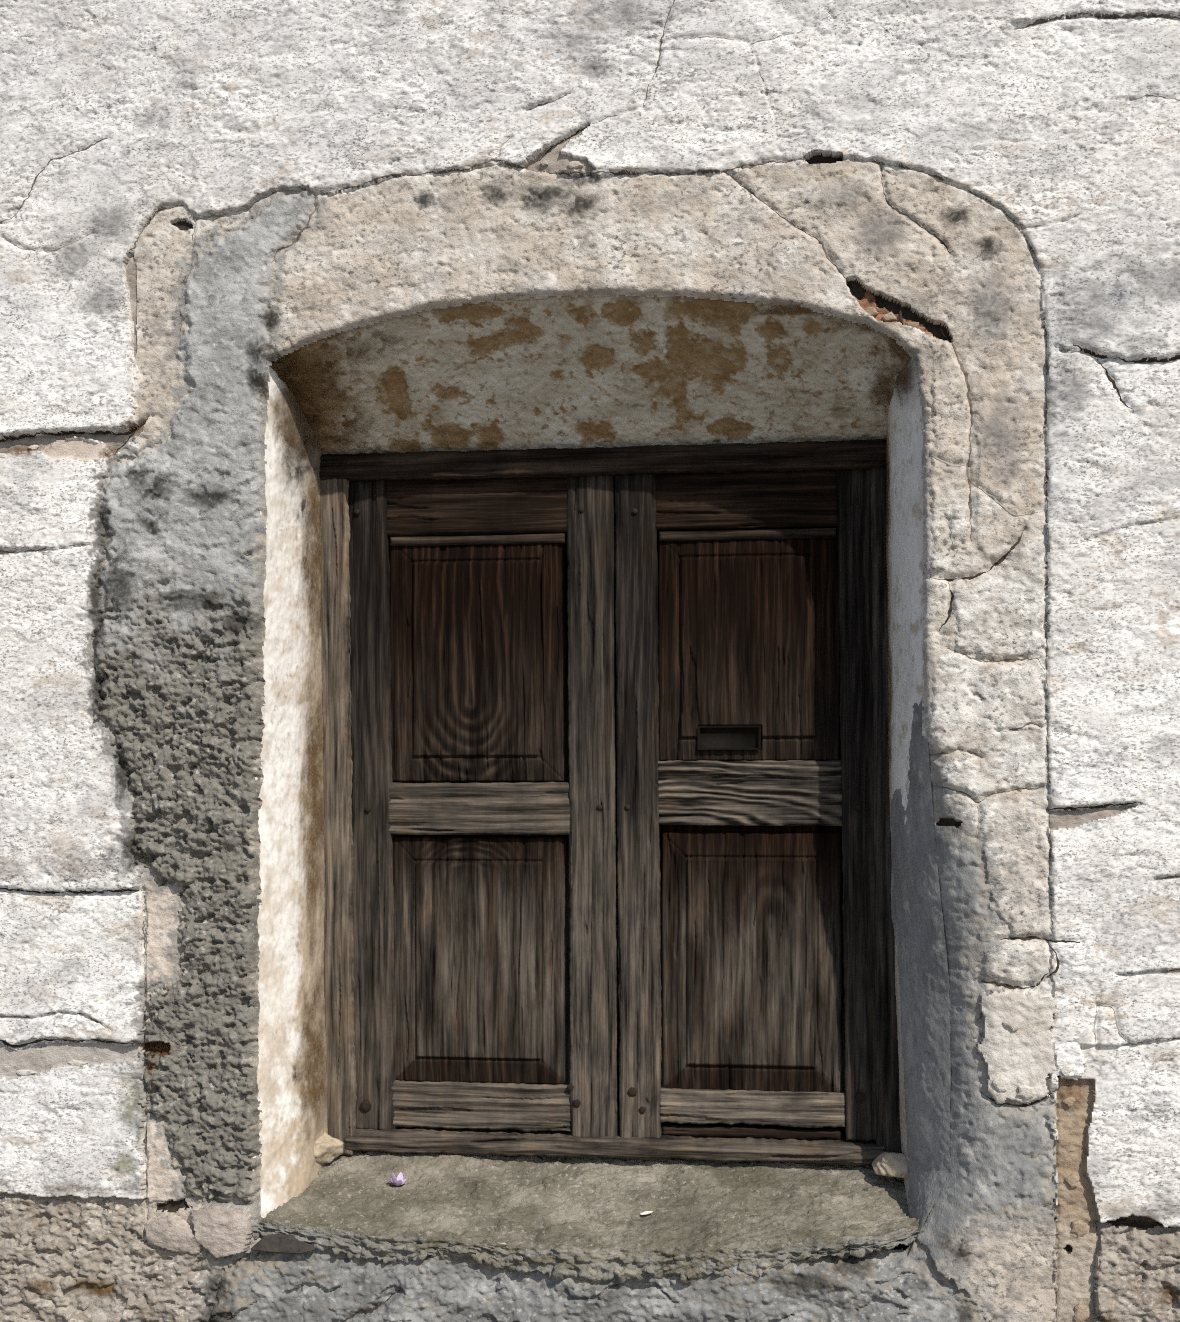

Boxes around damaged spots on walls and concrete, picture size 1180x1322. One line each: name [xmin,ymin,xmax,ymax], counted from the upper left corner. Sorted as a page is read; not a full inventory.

crack [644,0,798,102]
crack [1014,12,1180,29]
crack [0,138,108,253]
flaking render [173,220,193,231]
crack [129,115,849,285]
peeling [569,298,792,424]
flaking render [847,278,953,343]
crack [843,159,1180,434]
flaking render [145,894,182,989]
flaking render [895,939,909,1161]
flaking render [147,1122,190,1213]
flaking render [1056,1075,1163,1322]